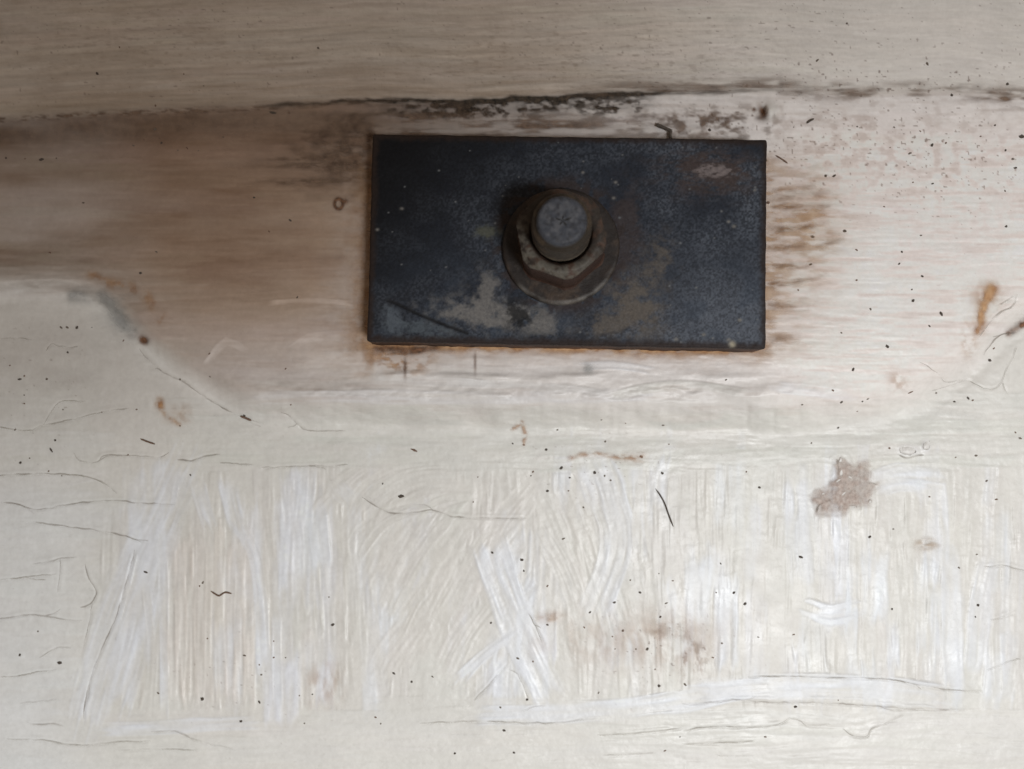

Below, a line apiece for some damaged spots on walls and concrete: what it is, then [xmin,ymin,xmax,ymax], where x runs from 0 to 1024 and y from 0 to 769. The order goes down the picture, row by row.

rust [357,186,731,367]
rust [975,284,997,334]
peeling [813,457,874,513]